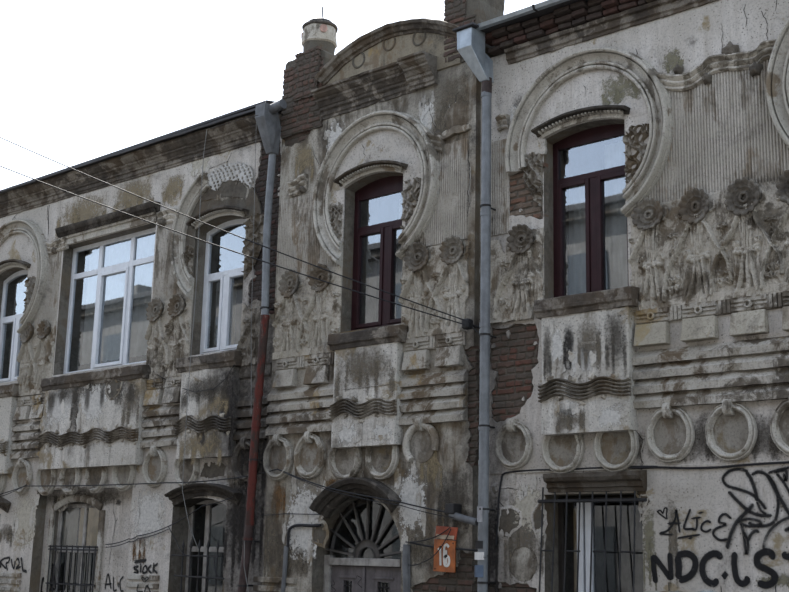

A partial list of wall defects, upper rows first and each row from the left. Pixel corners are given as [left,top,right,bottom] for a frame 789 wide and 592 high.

flaking render [188,131,310,315]
flaking render [509,171,549,220]
flaking render [490,324,539,422]
water stain [544,334,552,377]
peeling [550,320,597,378]
water stain [563,318,626,377]
water stain [48,382,109,430]
water stain [115,381,139,426]
water stain [556,409,585,432]
peeling [498,470,548,553]